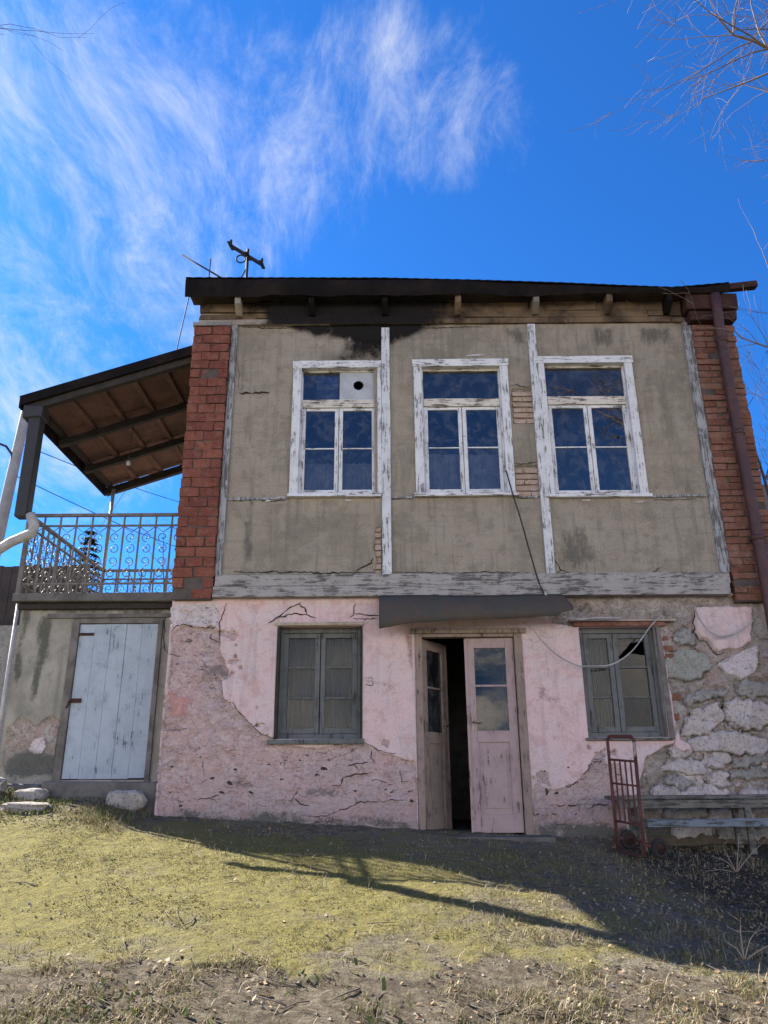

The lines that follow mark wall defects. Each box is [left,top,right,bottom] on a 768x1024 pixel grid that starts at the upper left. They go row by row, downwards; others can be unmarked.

flaking render [511,390,534,424]
flaking render [514,466,540,498]
flaking render [374,528,383,574]
crack [269,603,316,623]
crack [349,604,379,620]
peeling [156,604,418,829]
flaking render [532,596,768,841]
flaking render [4,716,60,773]
crack [280,744,409,824]